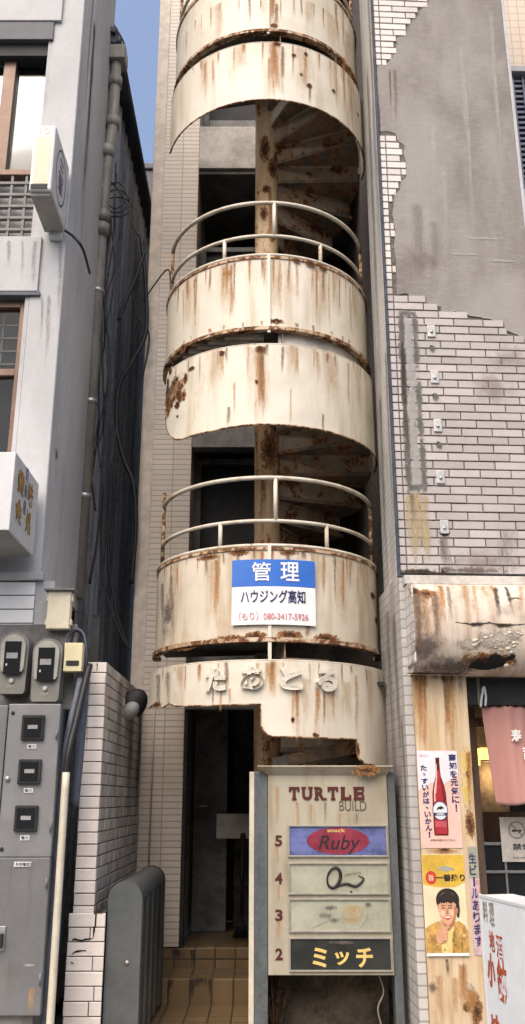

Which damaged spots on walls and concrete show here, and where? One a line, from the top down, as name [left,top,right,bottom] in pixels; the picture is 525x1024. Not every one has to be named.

corrosion [249,0,302,28]
corrosion [262,42,359,118]
corrosion [259,135,276,227]
spalling [376,0,525,340]
corrosion [248,258,351,307]
corrosion [255,345,268,400]
damp [400,493,507,575]
corrosion [164,550,364,608]
corrosion [217,626,360,650]
corrosion [408,586,451,658]
corrosion [444,676,455,728]
crack [70,914,97,964]